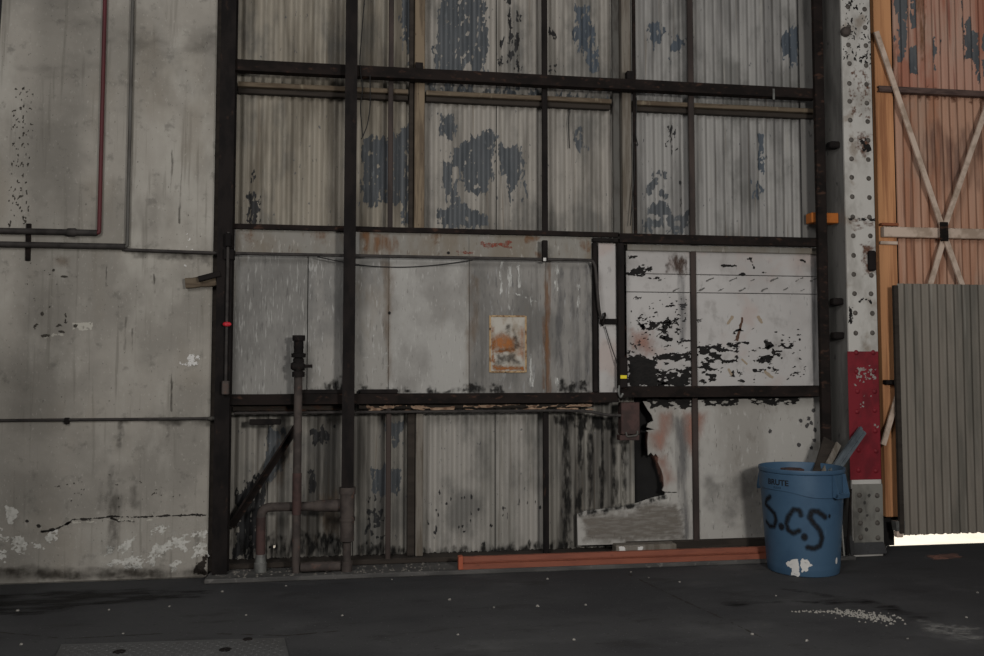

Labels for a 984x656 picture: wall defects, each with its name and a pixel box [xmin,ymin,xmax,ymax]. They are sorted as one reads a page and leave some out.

peeling [431,0,523,72]
peeling [572,3,599,73]
peeling [843,0,871,64]
peeling [893,0,918,75]
peeling [961,0,984,84]
peeling [357,123,409,226]
peeling [436,113,528,229]
peeling [626,255,660,279]
peeling [627,296,806,409]
peeling [0,505,58,563]
crack [25,513,206,533]
peeling [104,524,210,575]